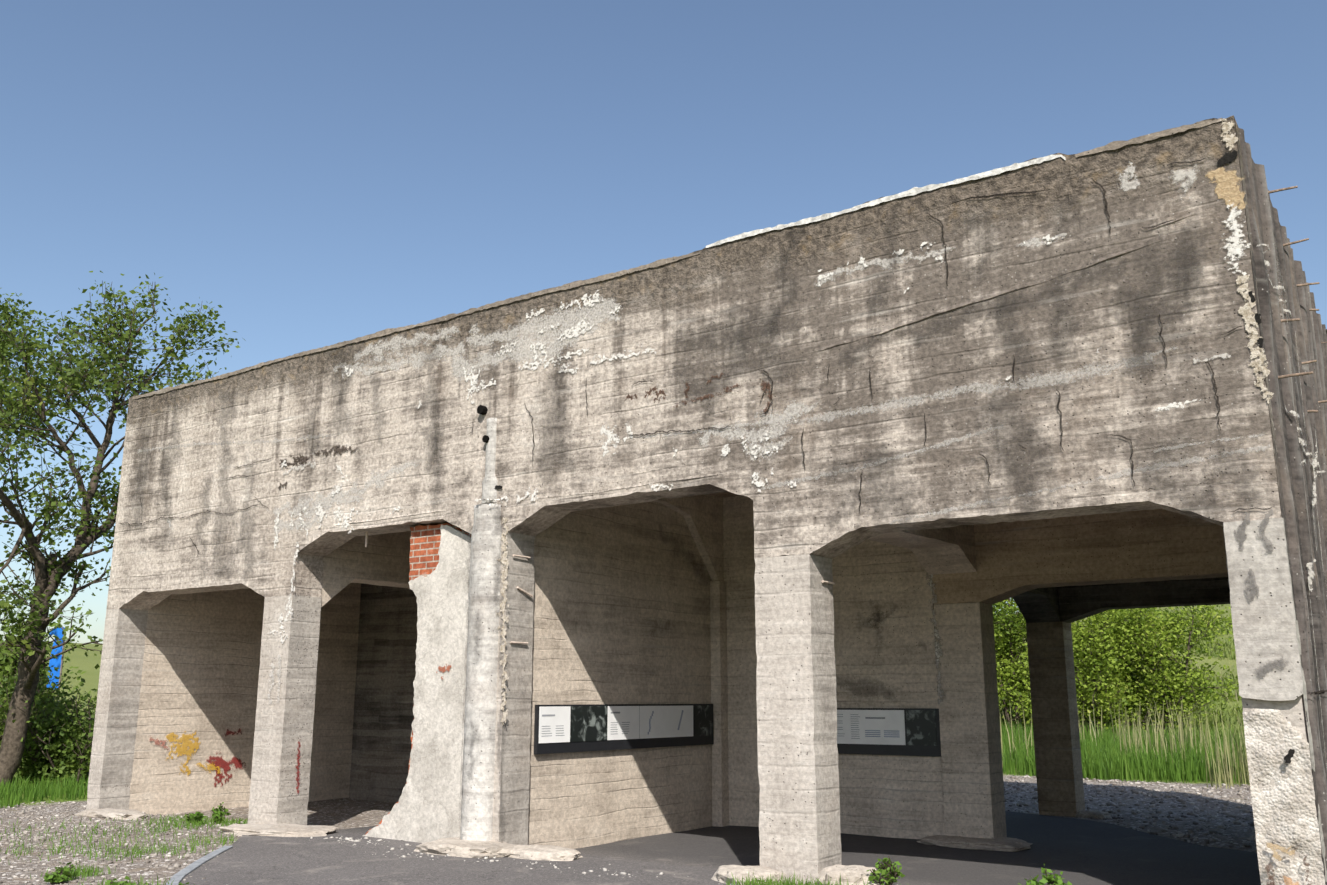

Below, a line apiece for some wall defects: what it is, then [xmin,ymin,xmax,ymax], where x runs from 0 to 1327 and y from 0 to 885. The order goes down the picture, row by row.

crack [927,213,949,286]
crack [967,190,1046,199]
crack [1092,178,1111,232]
spalling [1075,118,1273,404]
spalling [132,252,700,400]
leakage [333,290,656,404]
spalling [1242,707,1326,885]